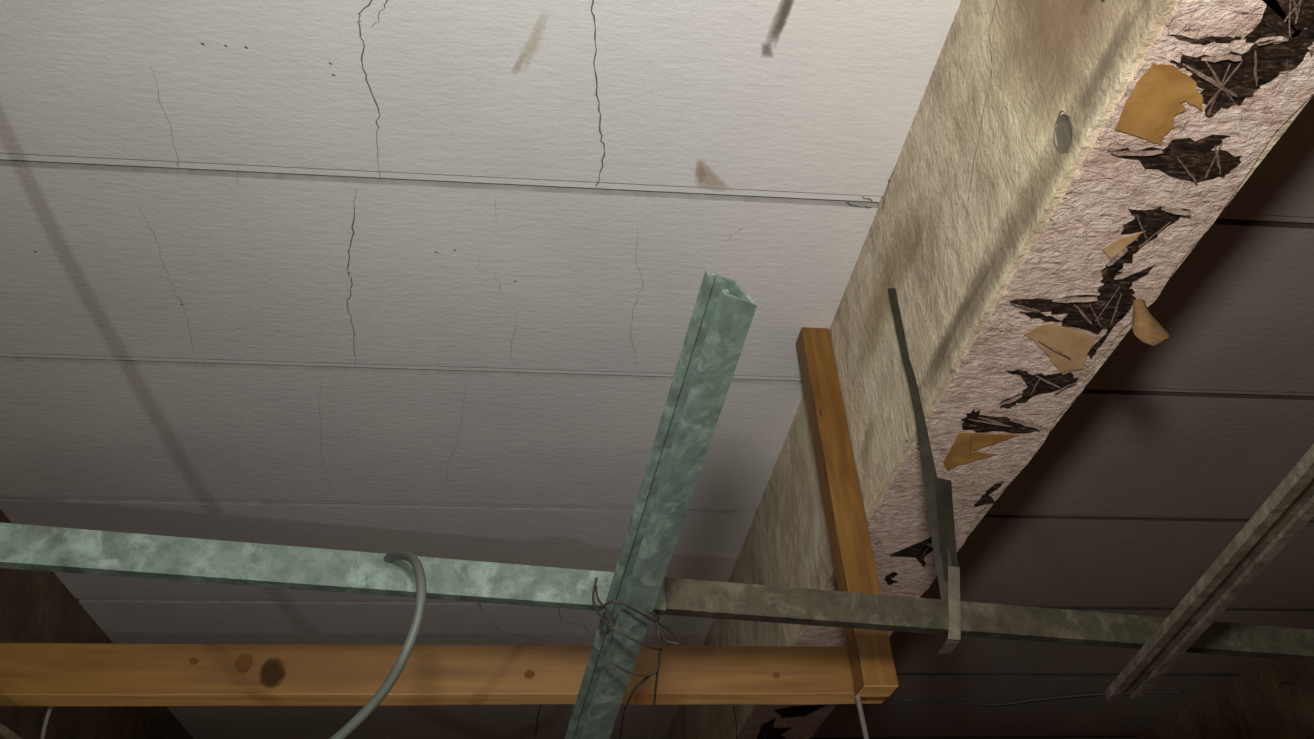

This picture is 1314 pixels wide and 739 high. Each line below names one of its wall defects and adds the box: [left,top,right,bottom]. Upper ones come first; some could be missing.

crack [357,0,388,178]
crack [591,0,605,187]
water stain [774,0,792,30]
peeling [1107,0,1314,184]
crack [347,197,356,363]
peeling [943,206,1191,470]
peeling [884,537,933,585]
peeling [974,481,1004,507]
peeling [757,705,827,739]